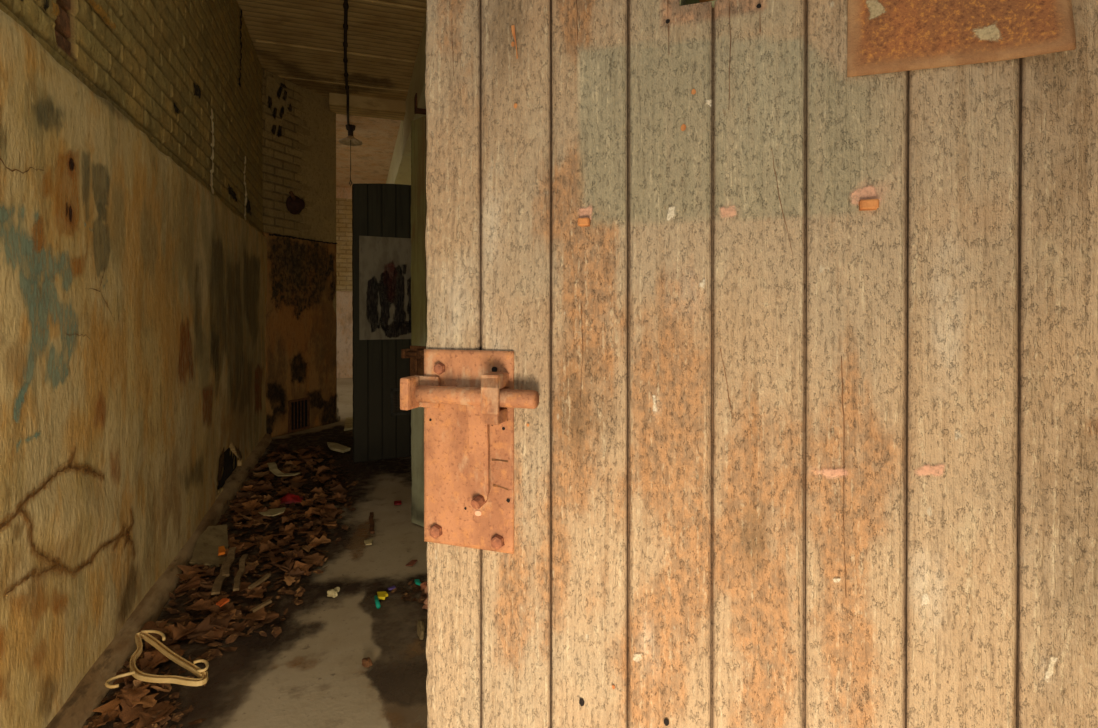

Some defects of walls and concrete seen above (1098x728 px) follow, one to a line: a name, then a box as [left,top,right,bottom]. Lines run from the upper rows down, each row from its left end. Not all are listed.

peeling [0,206,78,422]
crack [0,448,135,595]
leakage [359,589,428,728]